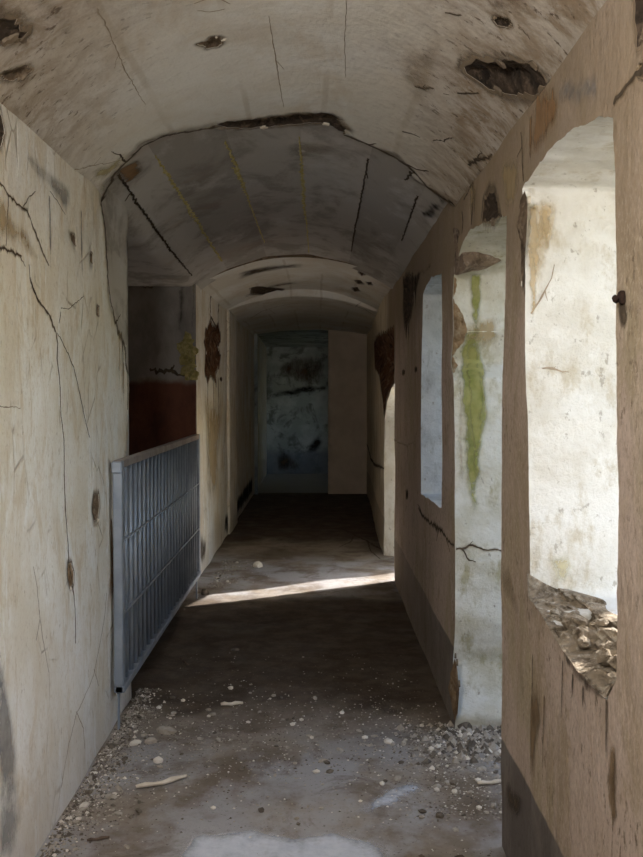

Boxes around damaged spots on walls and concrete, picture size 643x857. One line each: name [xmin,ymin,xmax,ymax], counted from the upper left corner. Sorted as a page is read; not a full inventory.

spalling [0,6,33,47]
spalling [632,0,643,80]
spalling [458,53,550,104]
crack [613,65,643,105]
crack [74,157,192,276]
crack [351,158,369,252]
leakage [471,275,481,323]
crack [149,364,184,377]
spalling [204,318,221,386]
crack [0,183,90,642]
leakage [467,346,483,467]
crack [418,505,501,562]